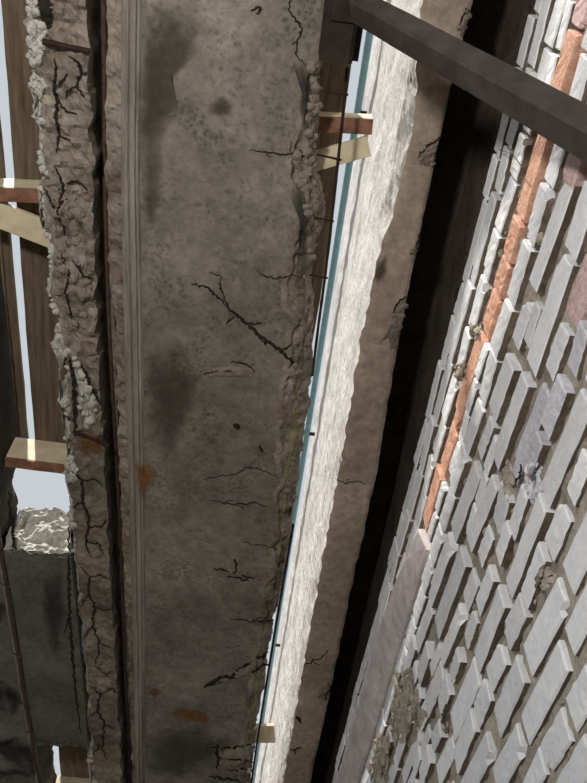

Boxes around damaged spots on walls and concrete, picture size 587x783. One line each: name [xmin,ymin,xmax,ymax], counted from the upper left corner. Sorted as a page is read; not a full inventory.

spalling [25,0,90,132]
crack [52,56,87,153]
crack [288,1,305,65]
crack [56,192,68,227]
crack [191,272,311,376]
crack [257,270,302,280]
spalling [36,0,132,783]
spalling [8,492,17,549]
spalling [0,543,42,783]
crack [64,471,118,758]